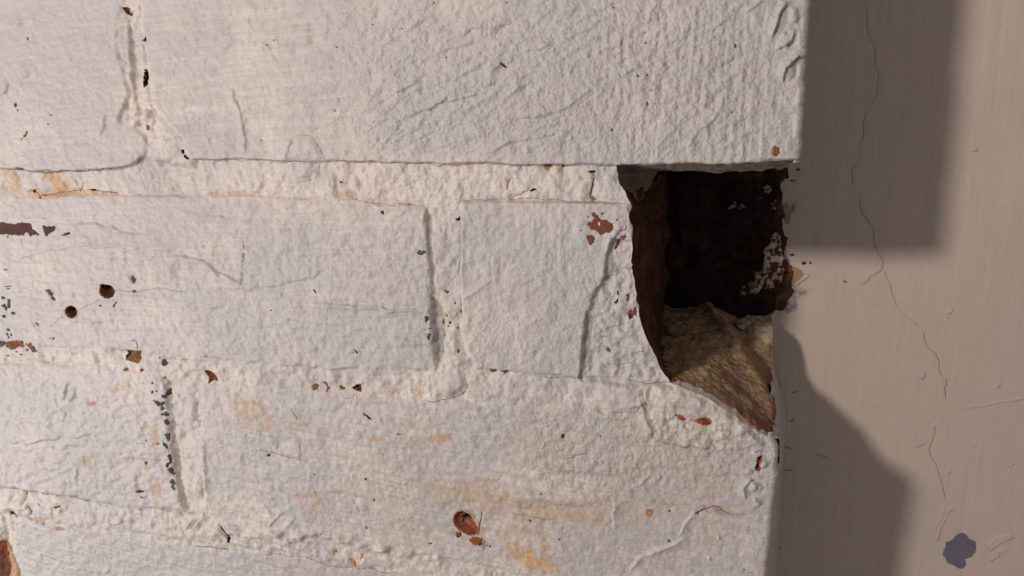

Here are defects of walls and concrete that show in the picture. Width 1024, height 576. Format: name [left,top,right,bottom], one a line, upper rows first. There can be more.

peeling [0,222,70,238]
spalling [580,146,797,471]
peeling [456,513,482,547]
spalling [0,539,20,576]